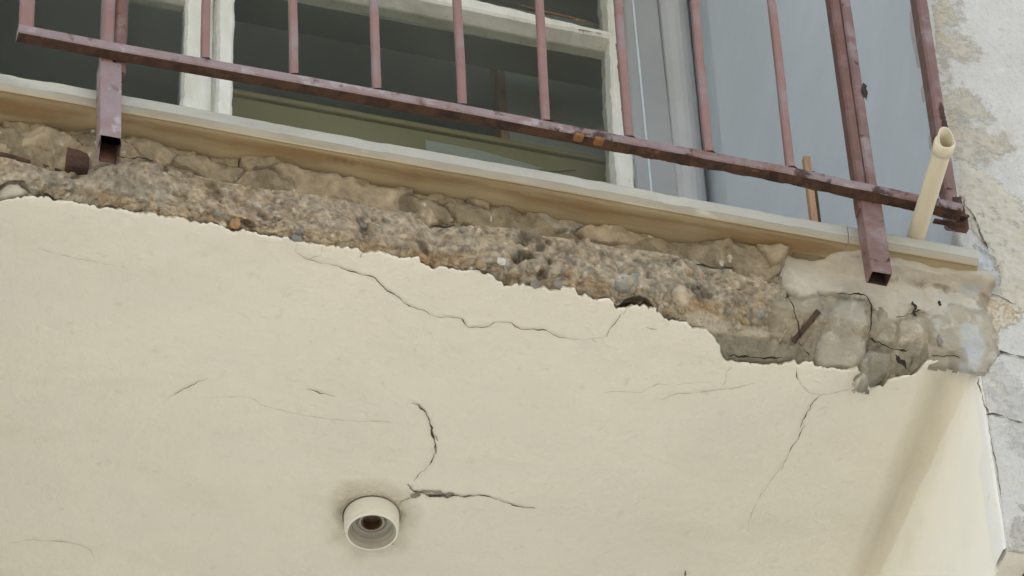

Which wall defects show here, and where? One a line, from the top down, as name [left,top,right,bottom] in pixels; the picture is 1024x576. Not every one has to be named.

spalling [0,0,1024,394]
crack [295,246,620,343]
crack [399,403,535,509]
crack [748,370,852,524]